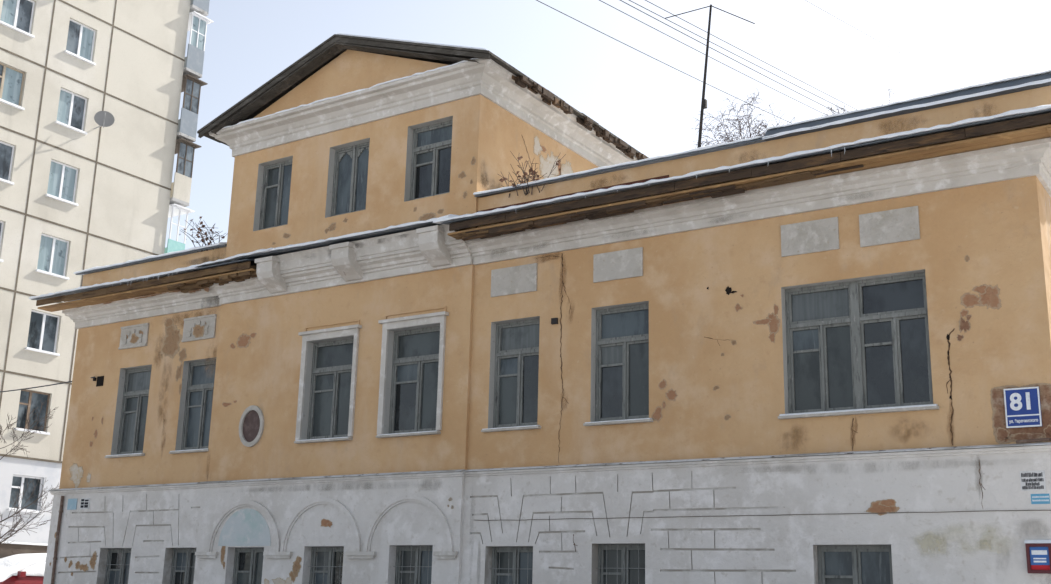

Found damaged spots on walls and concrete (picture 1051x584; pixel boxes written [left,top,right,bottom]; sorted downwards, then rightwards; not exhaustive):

peeling [533,136,573,179]
peeling [160,318,206,395]
spalling [230,333,256,349]
crack [536,256,571,462]
spalling [753,304,780,342]
spalling [946,284,1002,355]
spalling [651,379,678,422]
crack [946,328,955,445]
flaking render [866,499,900,516]
peeling [64,551,97,576]
peeling [264,556,302,584]